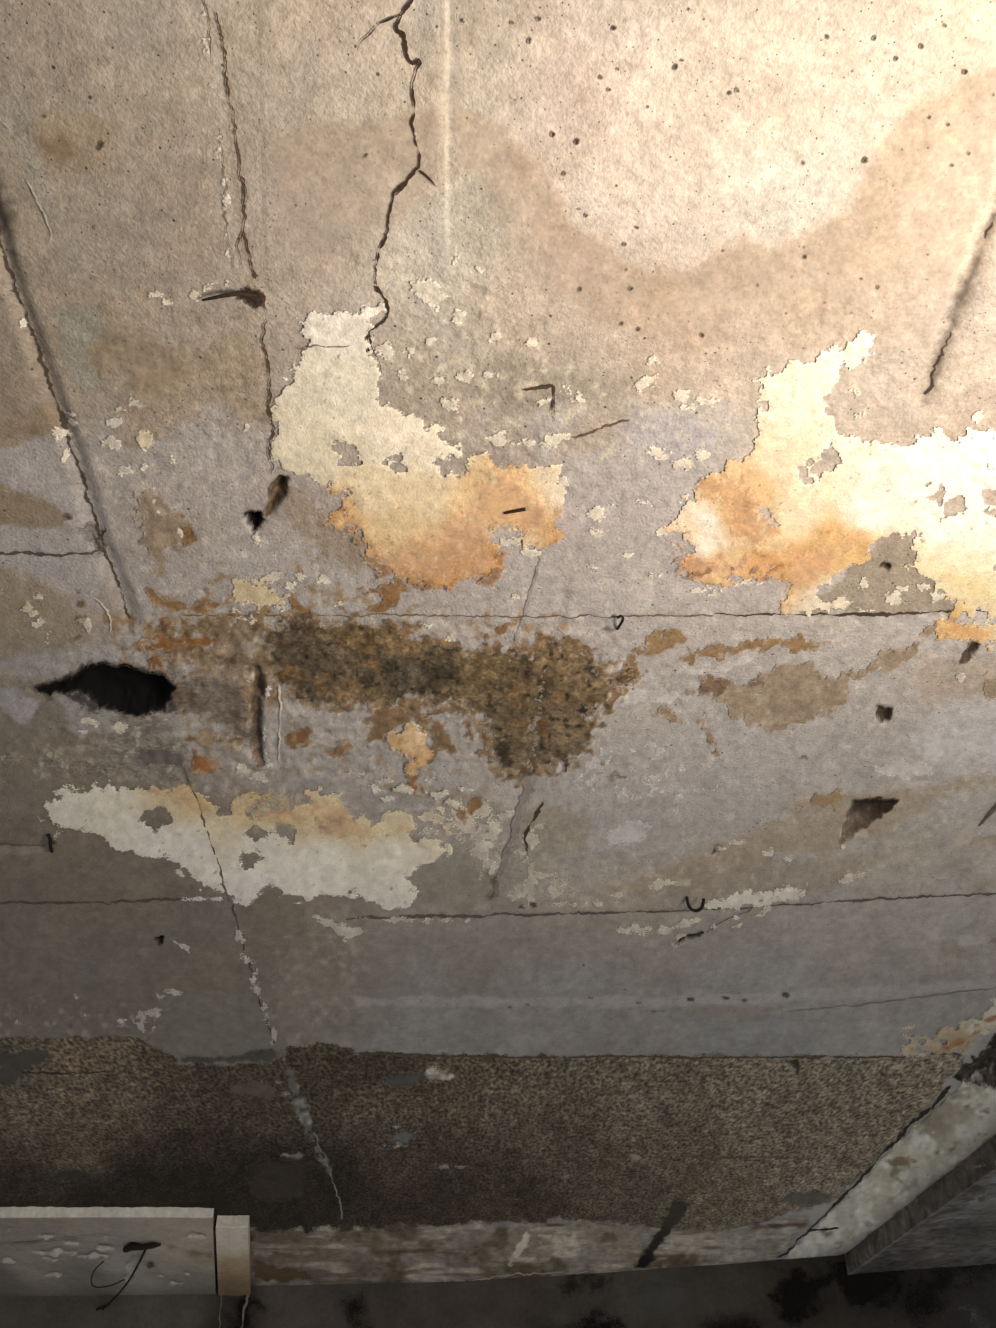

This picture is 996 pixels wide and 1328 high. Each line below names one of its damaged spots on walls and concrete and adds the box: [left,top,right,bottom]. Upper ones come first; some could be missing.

crack [216,0,437,472]
leakage [457,70,996,304]
crack [0,225,130,619]
peeling [23,661,624,943]
leakage [0,605,717,811]
corrosion [353,537,451,613]
peeling [244,302,571,590]
corrosion [482,567,507,588]
crack [184,610,988,619]
efflorescence [599,819,652,846]
corrosion [673,475,785,585]
spalling [0,988,996,1328]